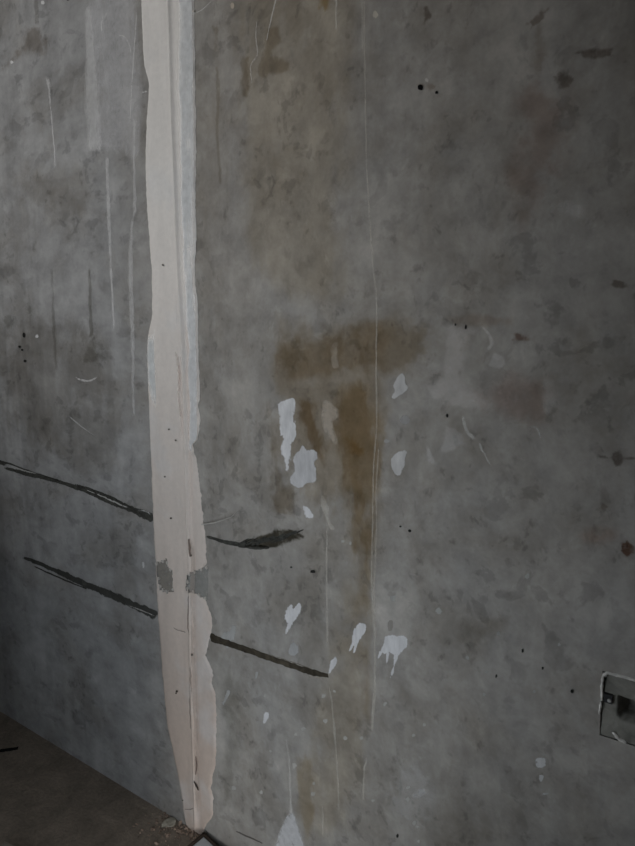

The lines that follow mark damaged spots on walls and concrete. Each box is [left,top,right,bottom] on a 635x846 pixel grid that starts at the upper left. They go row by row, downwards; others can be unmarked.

crack [0,460,153,522]
crack [24,557,158,619]
spalling [155,558,174,593]
spalling [186,566,208,600]
crack [210,633,329,678]